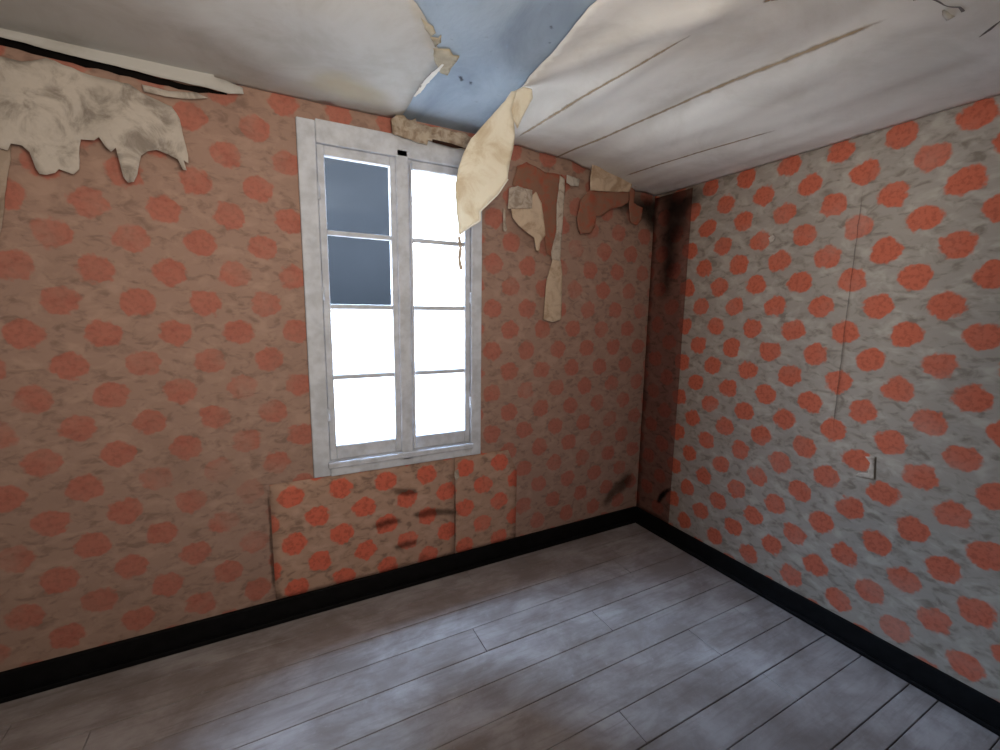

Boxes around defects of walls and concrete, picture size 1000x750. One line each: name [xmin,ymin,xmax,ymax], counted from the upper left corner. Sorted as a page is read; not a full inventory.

crack [913,0,965,21]
spalling [421,18,459,76]
peeling [391,87,533,270]